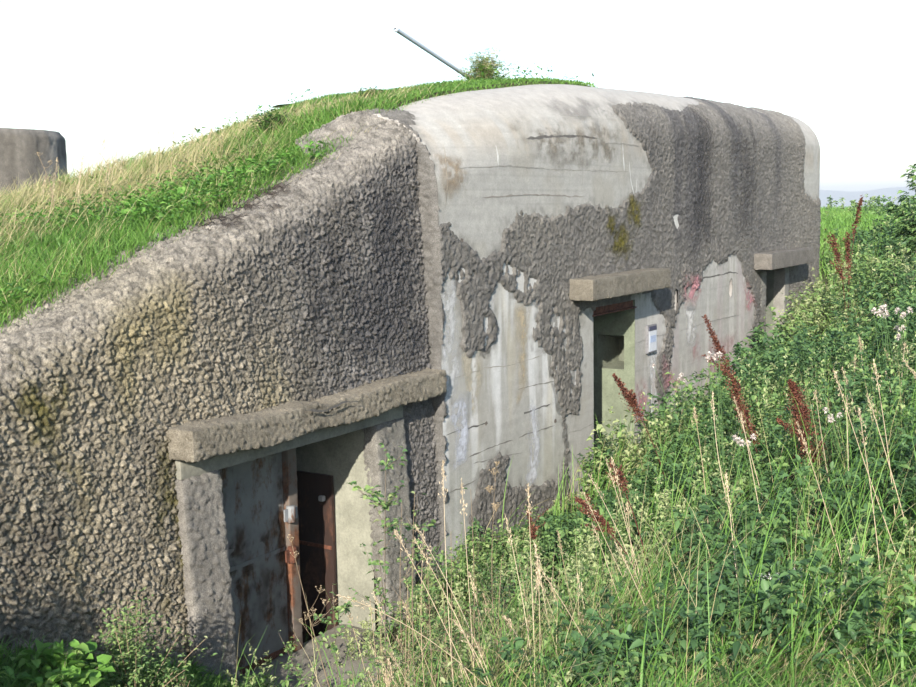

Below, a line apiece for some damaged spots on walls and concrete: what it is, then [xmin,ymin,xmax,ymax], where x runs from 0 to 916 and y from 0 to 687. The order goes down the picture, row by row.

peeling [396,84,699,260]
peeling [440,263,594,584]
peeling [631,254,755,459]
corrosion [261,510,285,554]